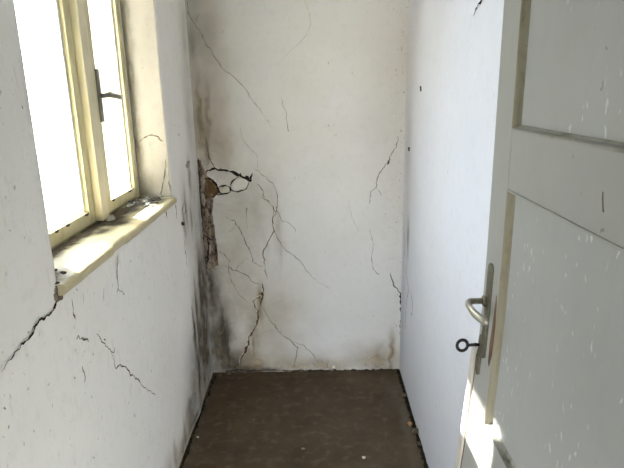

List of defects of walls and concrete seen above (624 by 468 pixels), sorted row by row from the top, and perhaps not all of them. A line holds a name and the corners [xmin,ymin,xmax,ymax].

crack [187,1,269,122]
spalling [186,160,219,276]
flaking render [231,178,248,191]
crack [0,300,57,370]
crack [77,334,155,395]
water stain [189,252,264,409]
crack [180,128,429,468]